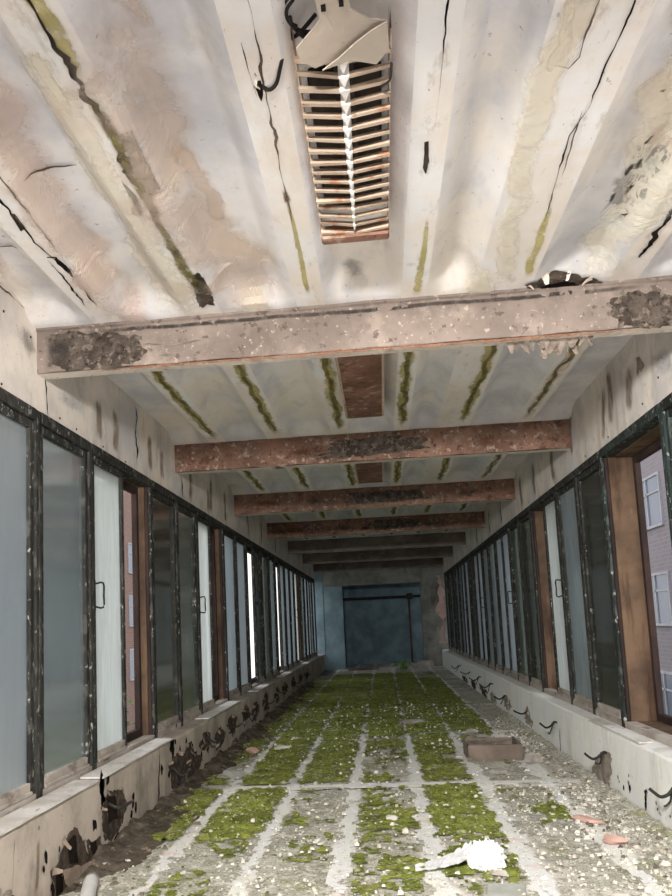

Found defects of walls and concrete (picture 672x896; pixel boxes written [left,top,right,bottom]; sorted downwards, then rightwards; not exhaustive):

crack [0,165,97,307]
leakage [50,343,68,363]
crack [26,0,105,123]
leakage [26,56,194,306]
leakage [244,278,267,312]
crack [241,1,296,247]
peeling [507,336,593,359]
spalling [525,270,603,290]
crack [544,0,636,222]
leakage [585,66,672,258]
crack [638,209,672,258]
spalling [43,769,137,896]